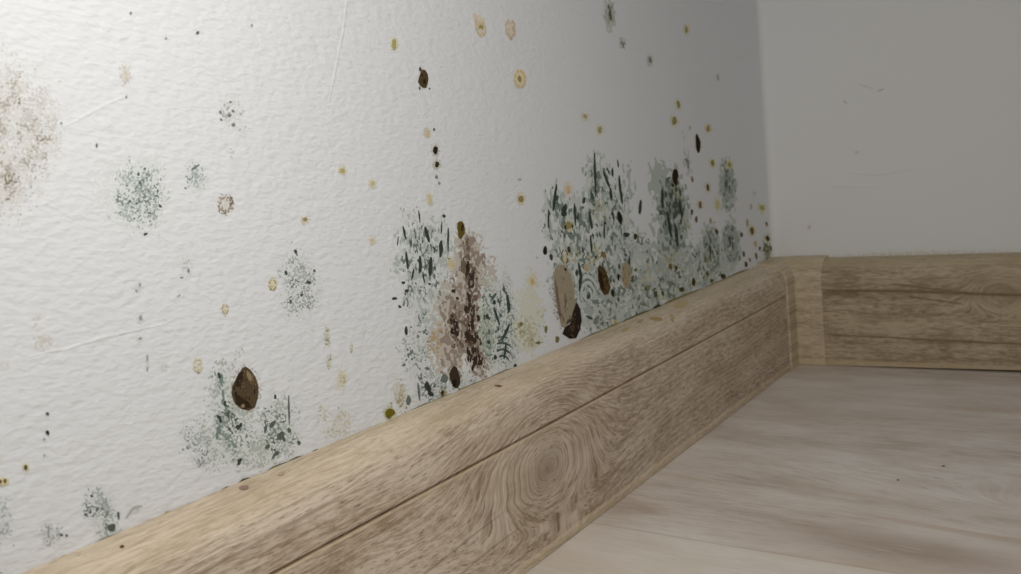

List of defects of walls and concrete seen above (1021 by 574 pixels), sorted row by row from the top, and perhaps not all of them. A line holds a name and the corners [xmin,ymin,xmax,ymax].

mould [0,36,68,240]
mould [87,147,208,245]
damp [272,242,329,331]
damp [383,98,772,419]
damp [323,326,360,392]
damp [179,346,302,490]
mould [0,477,18,555]
mould [79,485,143,542]